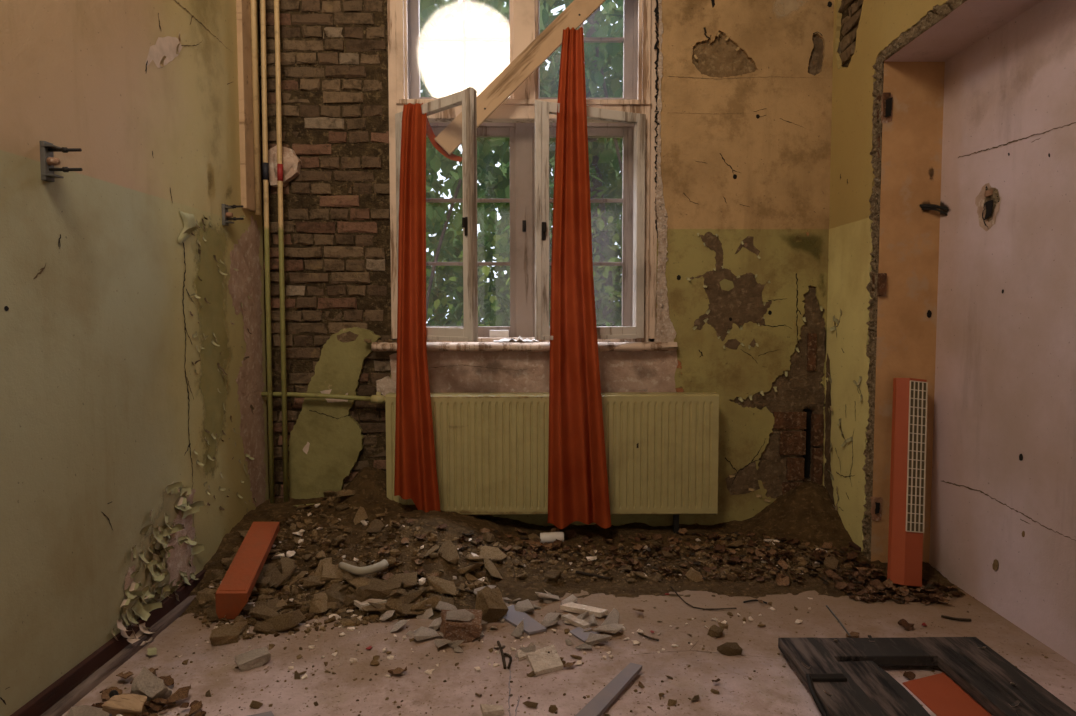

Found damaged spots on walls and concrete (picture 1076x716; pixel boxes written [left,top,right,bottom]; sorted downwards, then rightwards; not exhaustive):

flaking render [808,32,824,76]
flaking render [827,0,864,67]
peeling [598,0,772,392]
spalling [975,183,1002,232]
flaking render [861,0,967,561]
flaking render [112,0,397,646]
flaking render [427,351,550,393]
flaking render [725,286,838,511]
crack [942,480,1076,541]